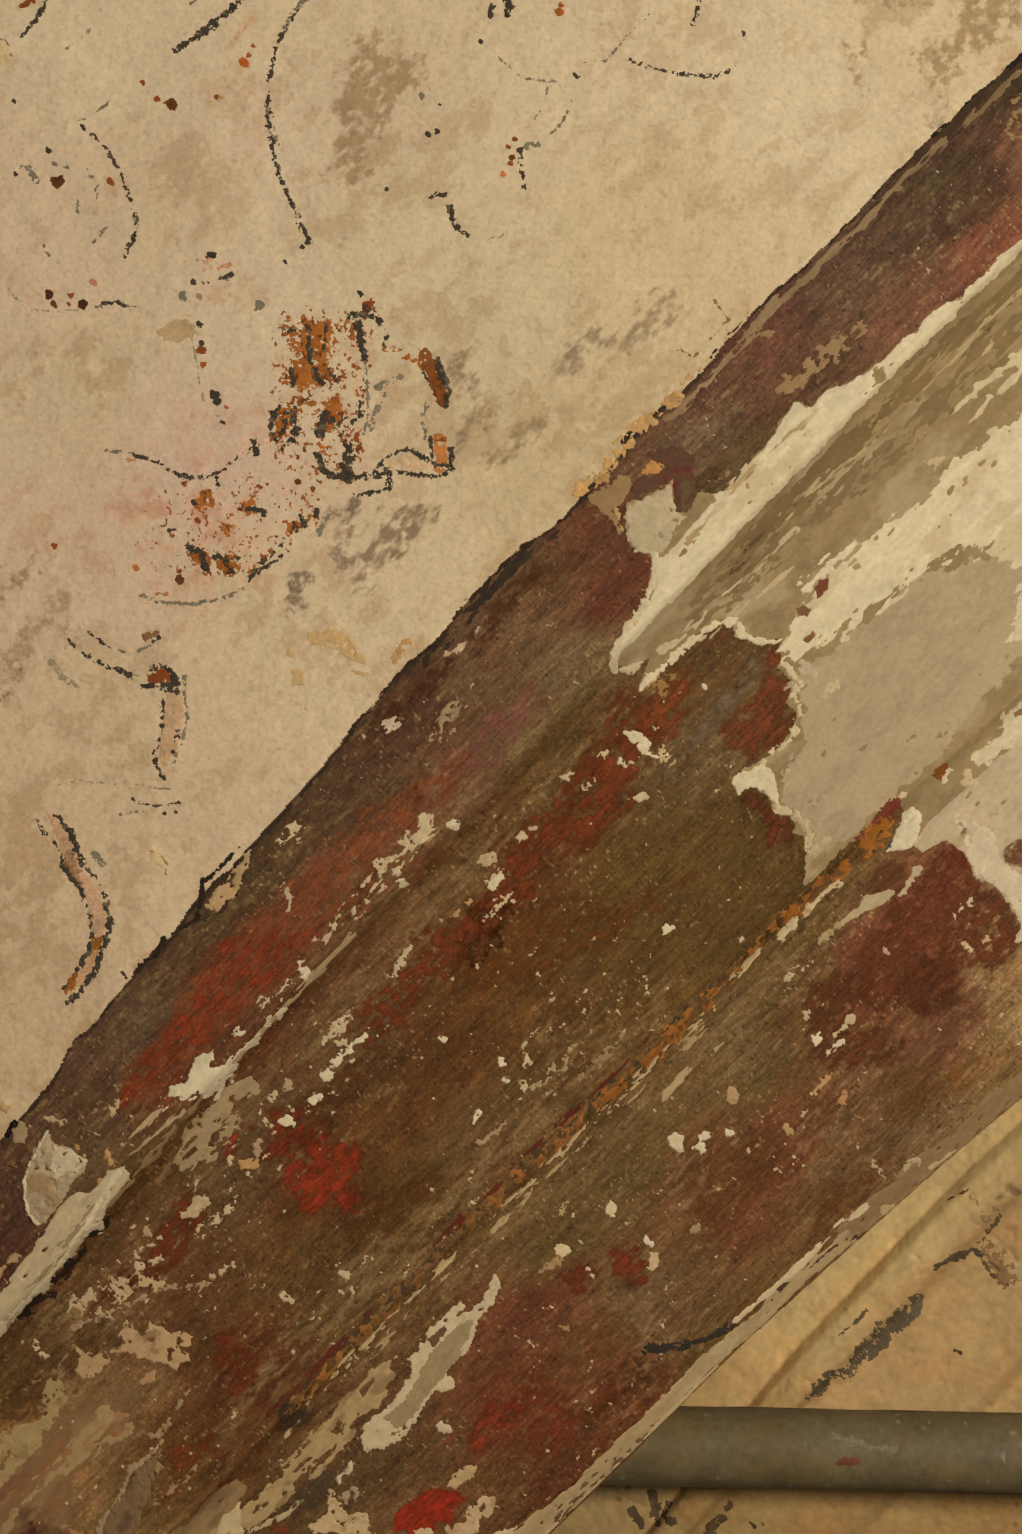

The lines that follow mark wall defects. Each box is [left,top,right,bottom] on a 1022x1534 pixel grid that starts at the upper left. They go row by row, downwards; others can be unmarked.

peeling [587,239,1022,982]
peeling [559,771,596,791]
peeling [515,825,538,843]
peeling [476,851,516,922]
peeling [802,1009,856,1105]
peeling [661,1066,696,1102]
peeling [667,1128,735,1155]
peeling [0,812,501,1534]
peeling [605,1200,617,1217]
peeling [538,1243,572,1273]
peeling [643,1235,660,1271]
peeling [414,1495,517,1534]